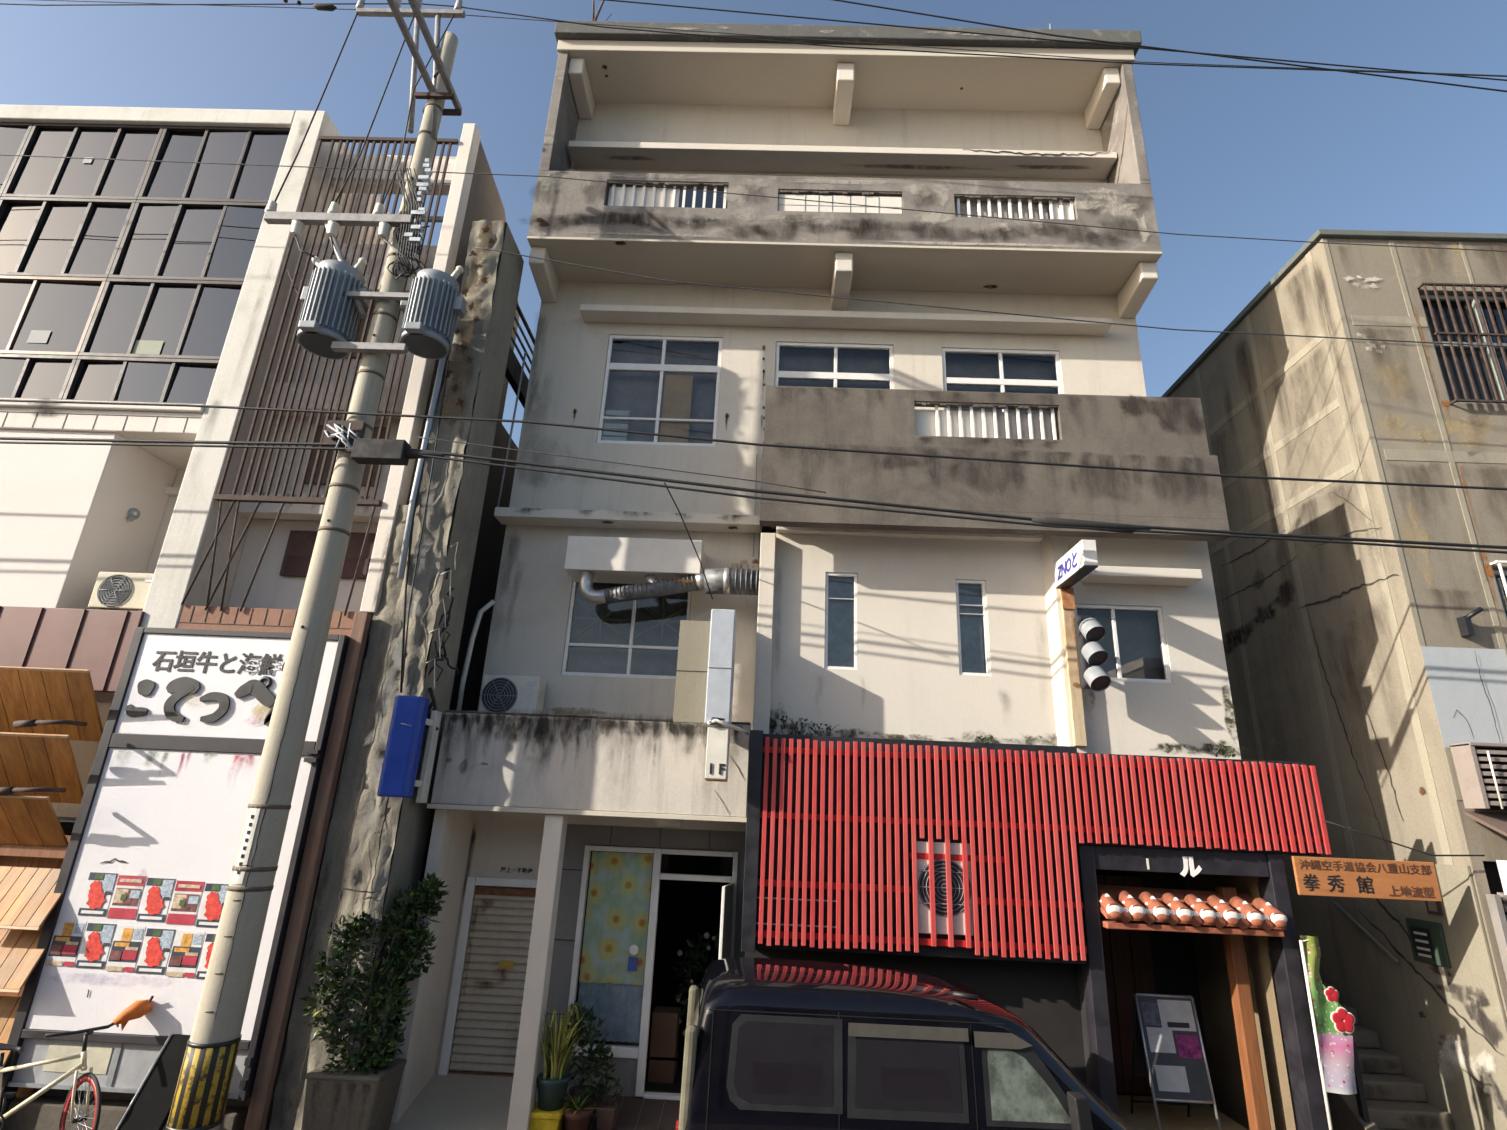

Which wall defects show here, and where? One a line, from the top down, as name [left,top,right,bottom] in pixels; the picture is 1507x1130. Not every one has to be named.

damp [442,711,708,755]